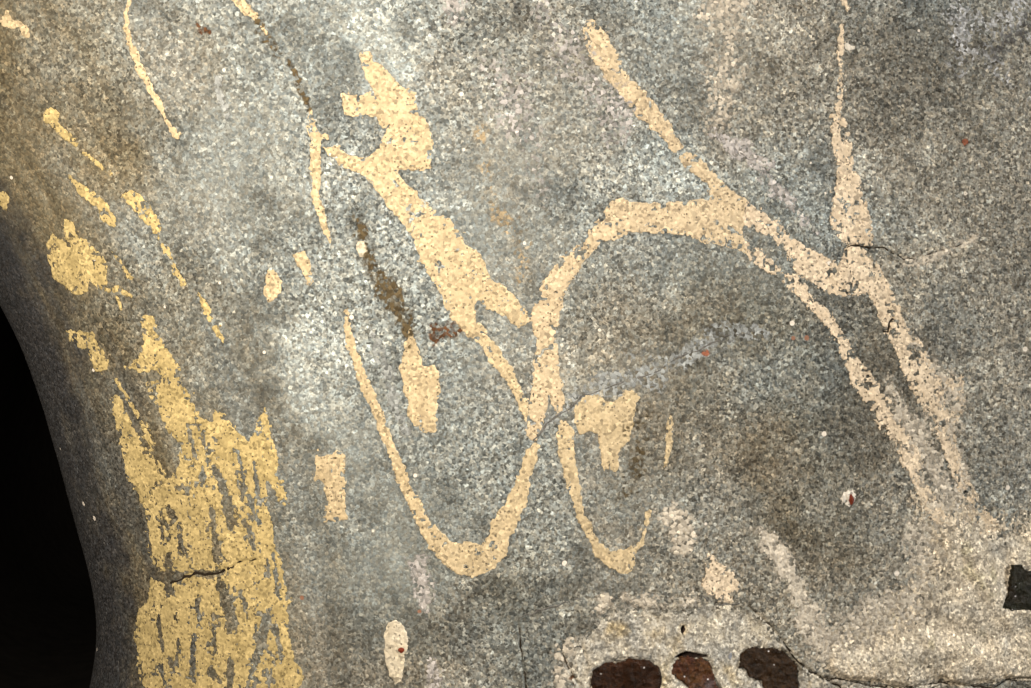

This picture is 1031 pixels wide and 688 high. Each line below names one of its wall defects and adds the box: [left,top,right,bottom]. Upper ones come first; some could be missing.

crack [845,244,961,260]
crack [170,558,256,584]
crack [516,598,580,688]